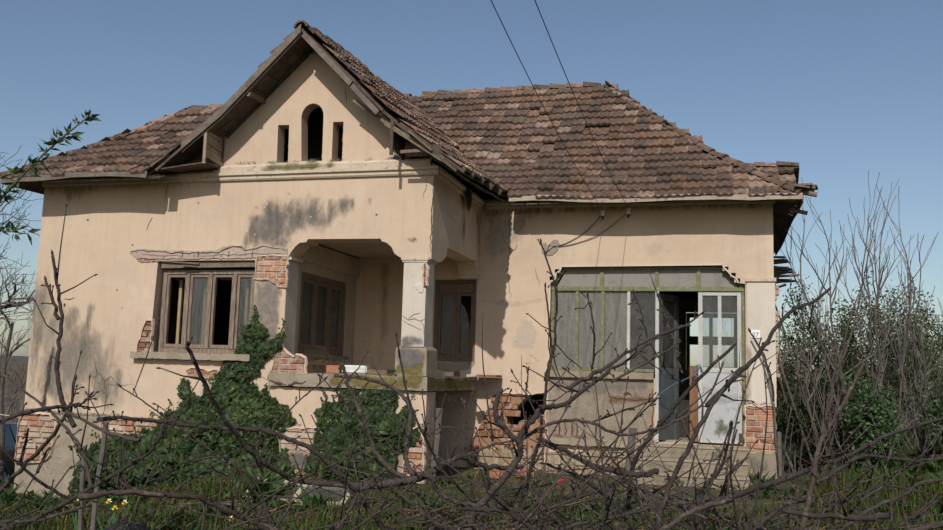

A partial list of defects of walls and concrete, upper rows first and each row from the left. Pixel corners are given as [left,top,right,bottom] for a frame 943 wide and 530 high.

leakage [241,191,349,246]
flaking render [254,254,290,289]
leakage [28,292,119,397]
flaking render [136,319,155,352]
flaking render [271,346,343,373]
flaking render [743,282,780,454]
flaking render [14,412,58,465]
flaking render [467,391,627,475]